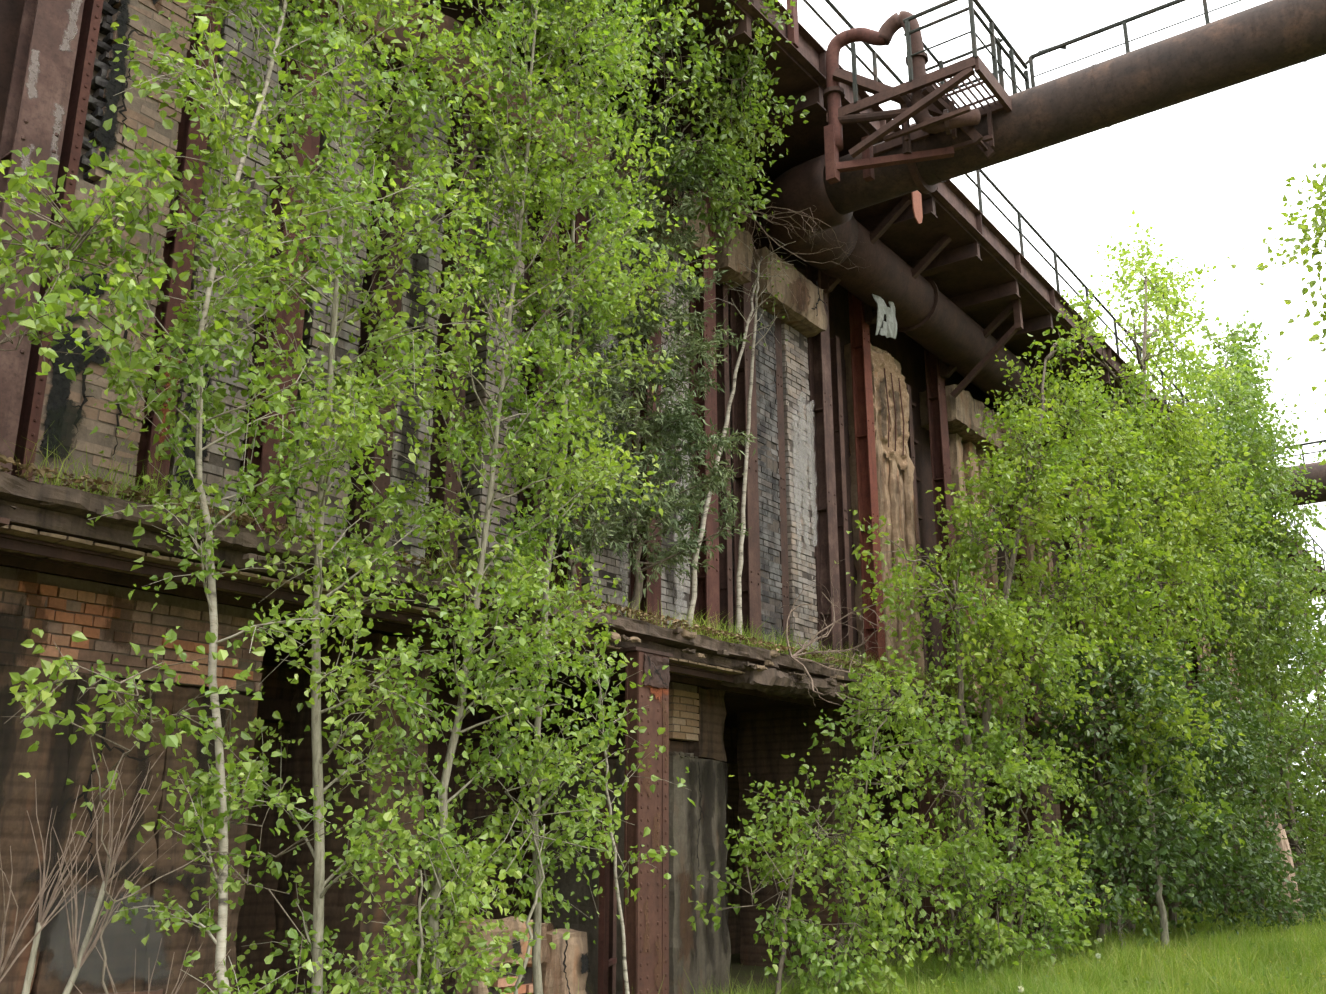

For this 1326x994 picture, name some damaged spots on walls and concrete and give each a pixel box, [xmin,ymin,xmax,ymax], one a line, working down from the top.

damp [689,760,729,960]